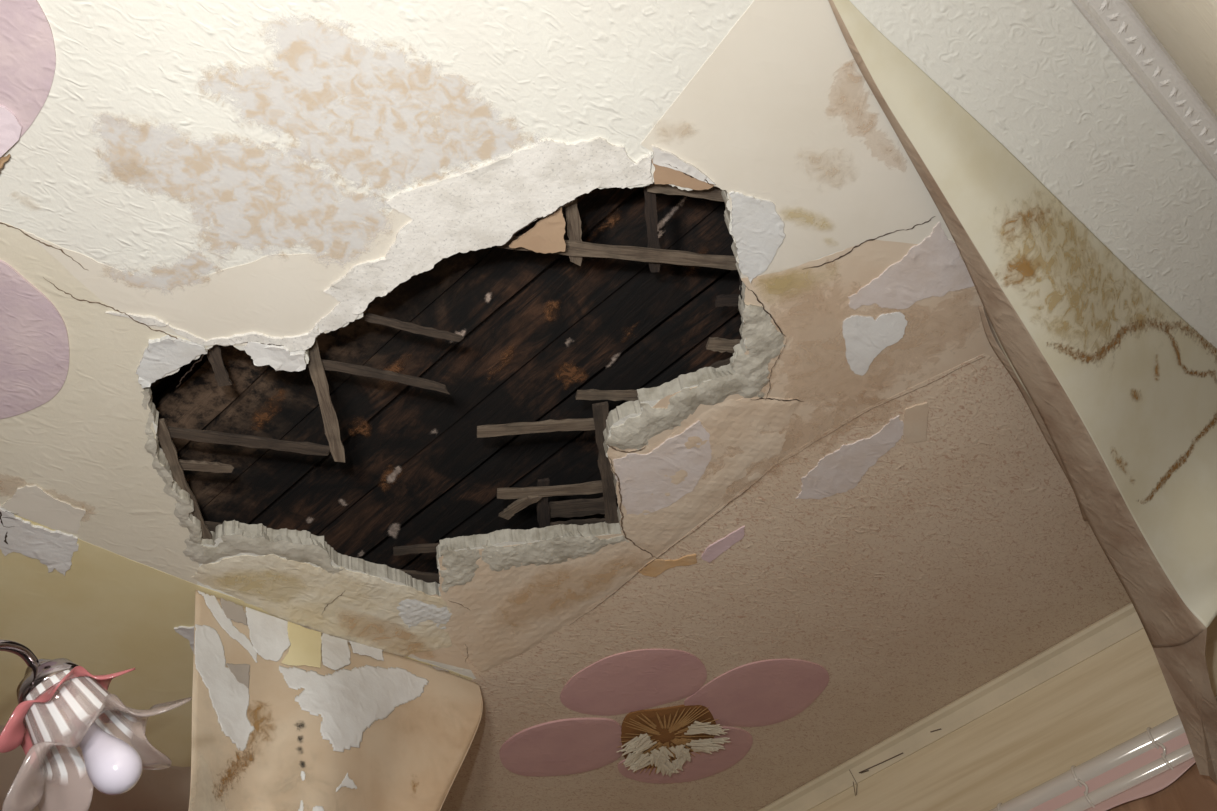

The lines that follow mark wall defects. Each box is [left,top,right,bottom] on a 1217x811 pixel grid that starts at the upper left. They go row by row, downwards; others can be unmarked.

leakage [102,19,533,290]
crack [0,222,178,339]
crack [747,288,803,402]
crack [804,216,935,269]
peeling [842,222,974,376]
leakage [1004,212,1217,380]
peeling [106,137,802,752]
peeling [796,415,904,499]
leakage [1145,414,1217,501]
peeling [0,484,86,576]
peeling [336,773,357,792]